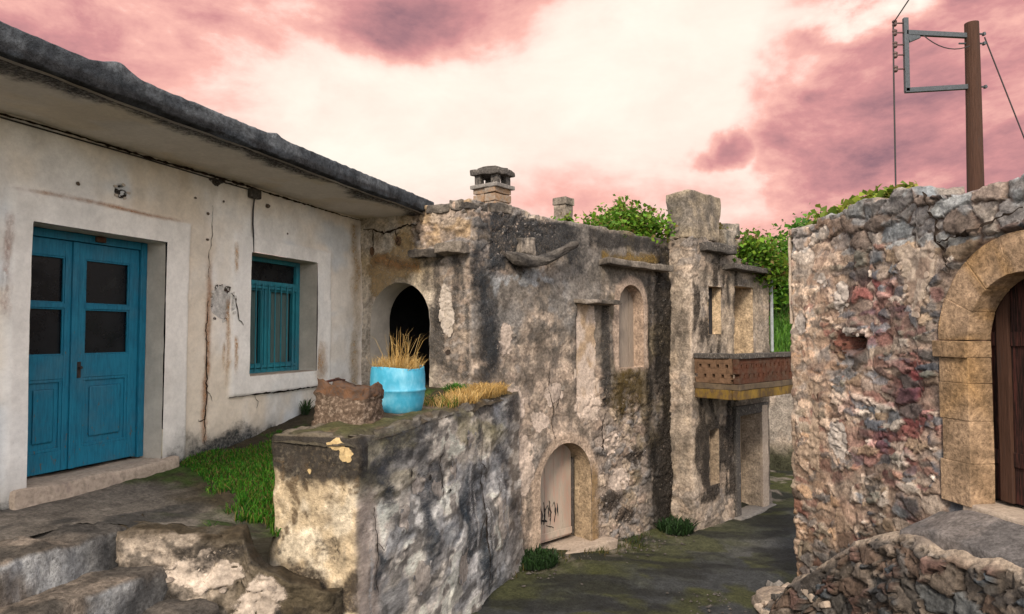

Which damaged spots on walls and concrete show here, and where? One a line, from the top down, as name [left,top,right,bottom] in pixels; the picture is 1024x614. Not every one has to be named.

crack [0,113,417,250]
peeling [211,284,237,323]
crack [198,213,317,442]
peeling [326,437,353,463]